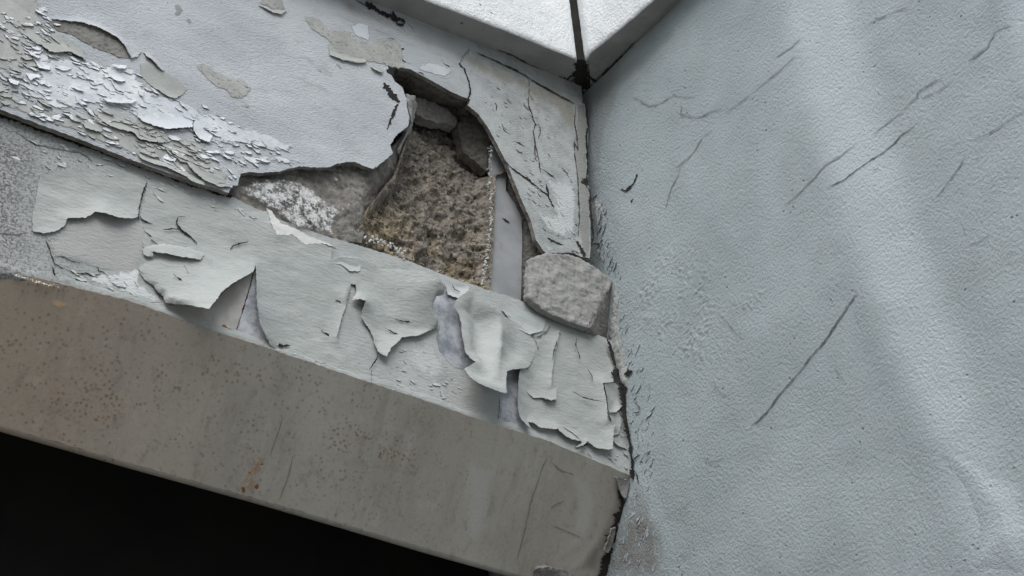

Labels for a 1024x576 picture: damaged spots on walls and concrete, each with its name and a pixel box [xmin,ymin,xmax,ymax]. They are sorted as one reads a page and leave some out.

crack [969,26,1011,61]
crack [357,0,634,257]
crack [632,39,800,208]
crack [784,78,953,206]
crack [936,111,1023,197]
peeling [0,7,660,576]
crack [751,295,855,426]